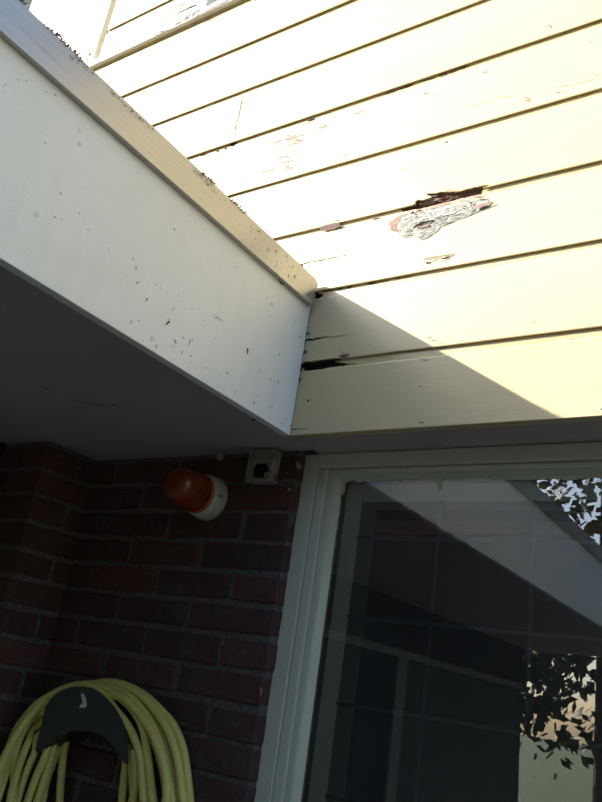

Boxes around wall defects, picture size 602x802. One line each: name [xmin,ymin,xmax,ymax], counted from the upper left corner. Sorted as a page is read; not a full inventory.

peeling [180,0,228,24]
peeling [228,116,336,197]
spalling [402,185,490,221]
spalling [415,254,455,264]